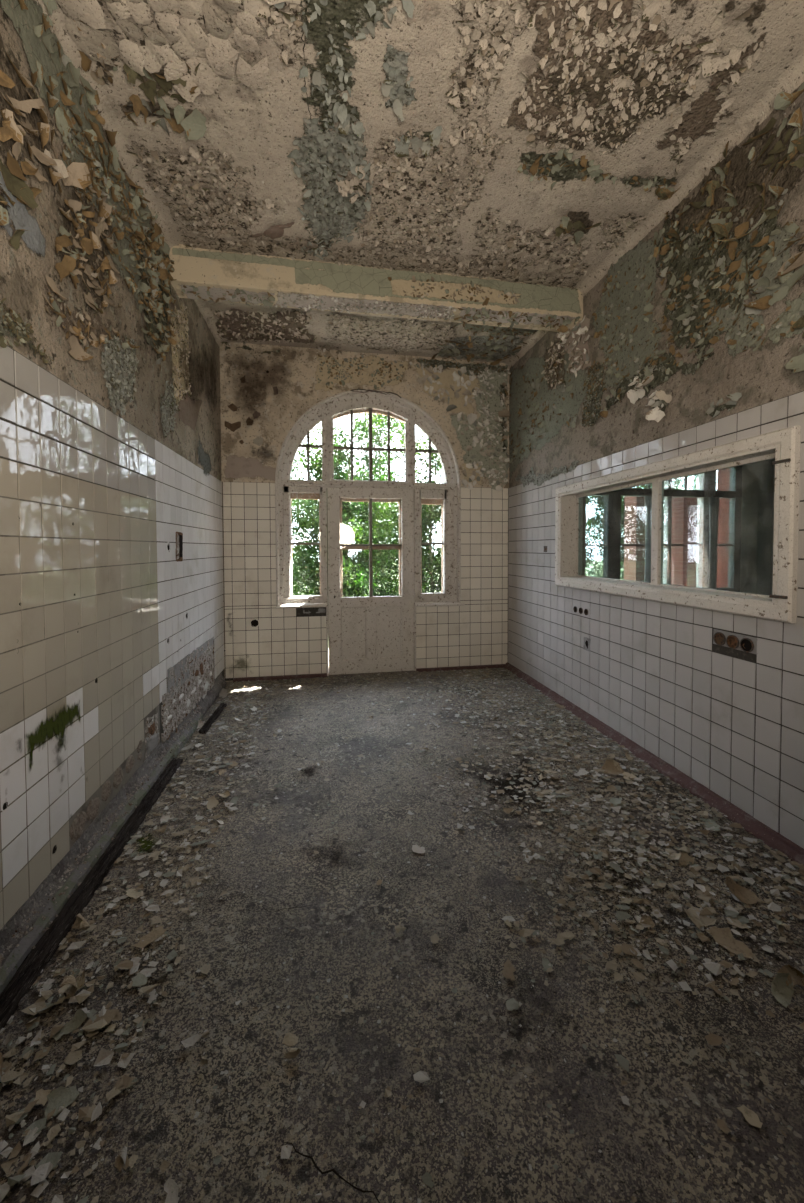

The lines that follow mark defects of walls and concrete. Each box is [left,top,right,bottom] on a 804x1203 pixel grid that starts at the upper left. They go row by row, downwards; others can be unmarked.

peeling [0,0,804,491]
flaking render [145,637,268,766]